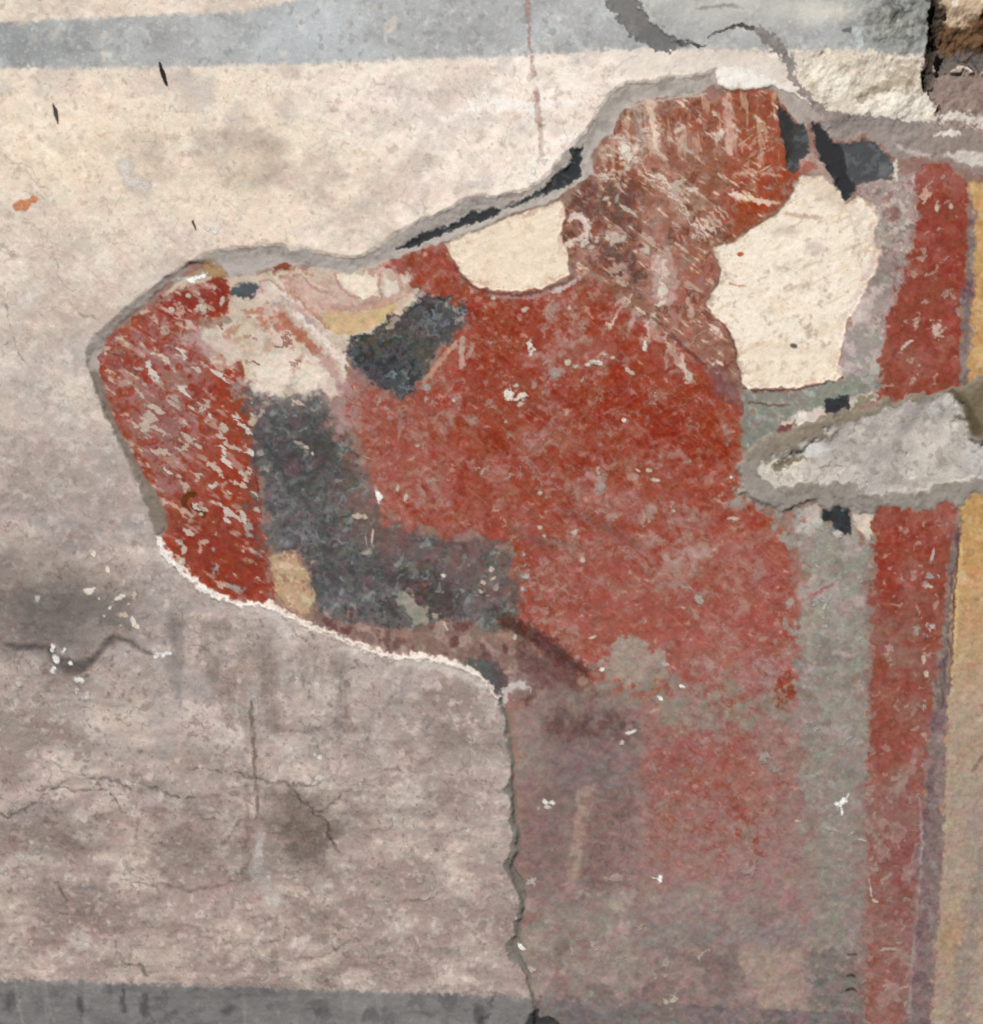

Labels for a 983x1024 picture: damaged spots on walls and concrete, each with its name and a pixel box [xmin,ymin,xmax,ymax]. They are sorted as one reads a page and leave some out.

hole [921,0,983,131]
peeling [127,338,269,538]
peeling [178,272,223,330]
flaking render [445,200,594,300]
peeling [504,381,537,407]
peeling [544,353,615,383]
peeling [599,127,694,287]
flaking render [661,175,880,390]
peeling [901,318,946,350]
peeling [918,175,953,212]
spalling [155,529,504,705]
crack [499,698,539,1007]